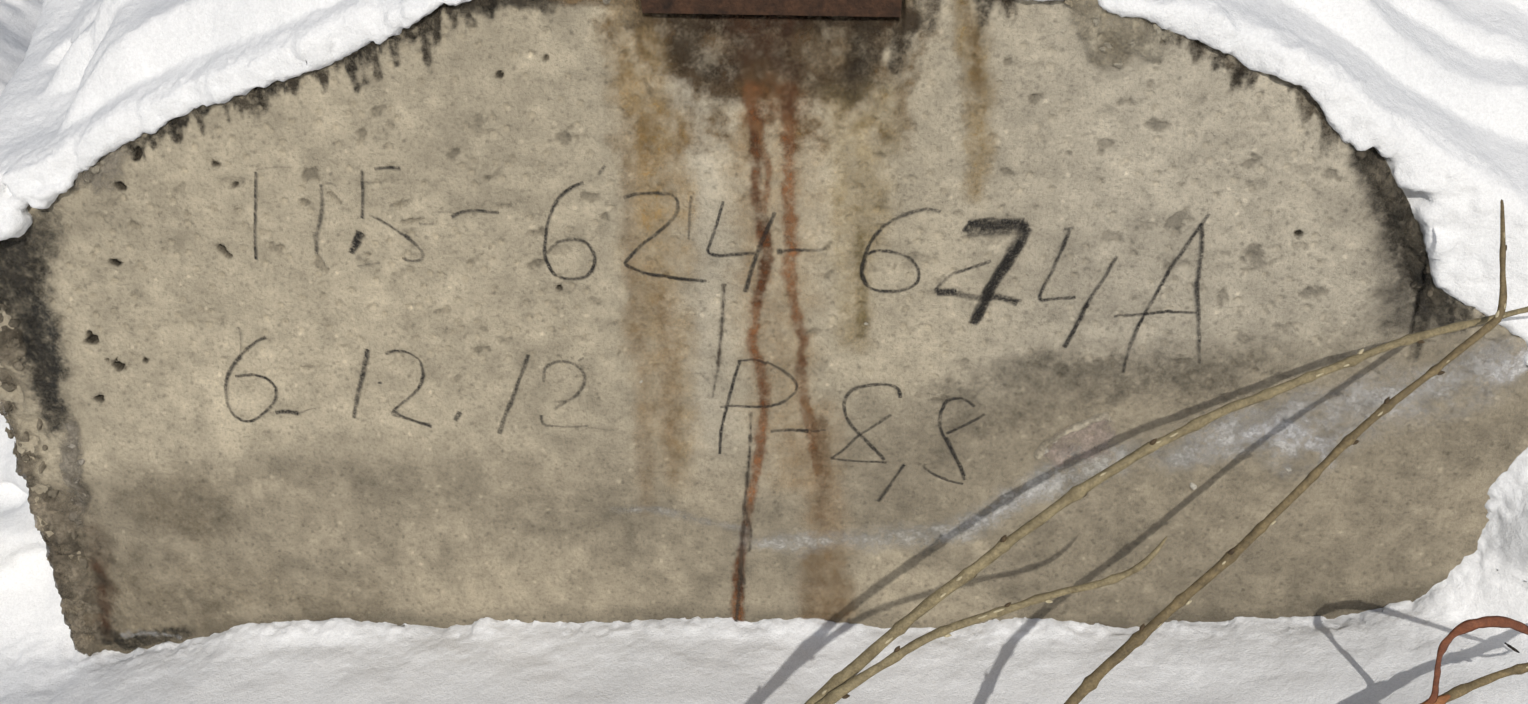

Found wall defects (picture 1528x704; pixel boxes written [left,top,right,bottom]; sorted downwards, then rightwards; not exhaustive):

damp [634,0,920,106]
corrosion [707,28,859,621]